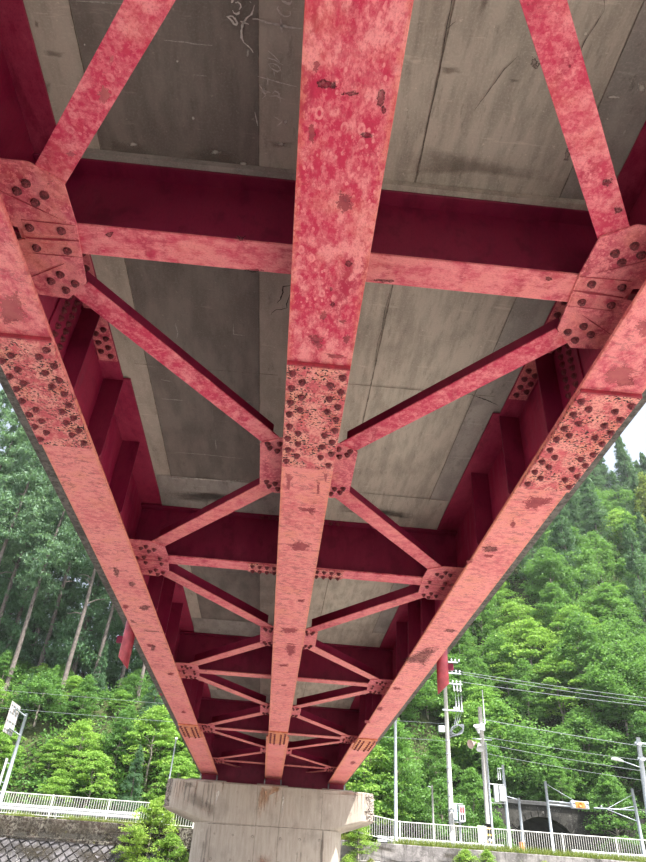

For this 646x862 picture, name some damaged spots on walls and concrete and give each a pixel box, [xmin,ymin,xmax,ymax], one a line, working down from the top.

crack [418,0,456,175]
peeling [335,190,354,213]